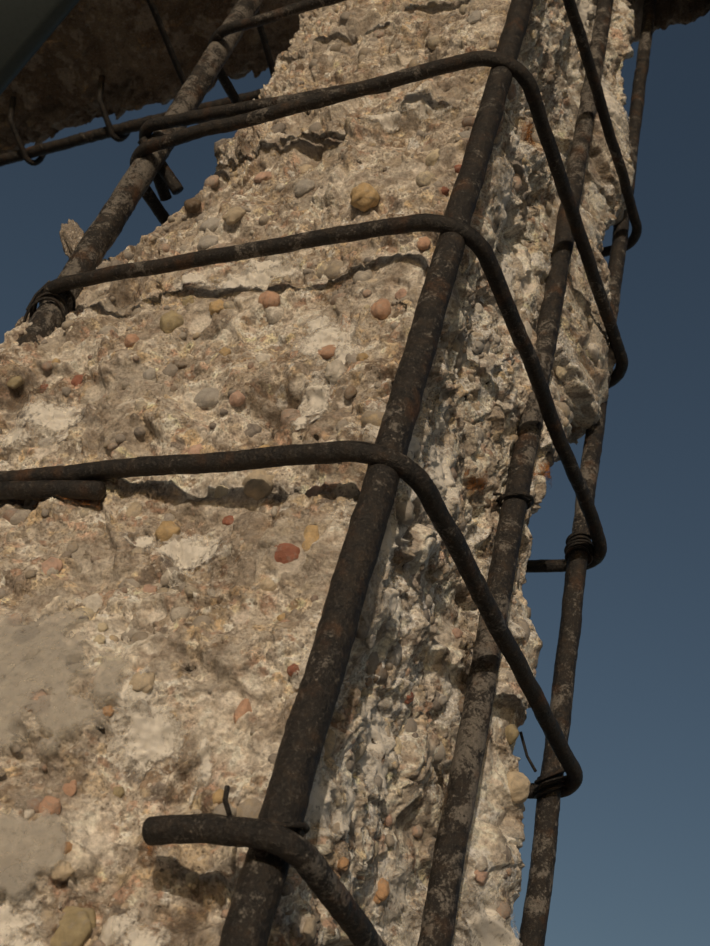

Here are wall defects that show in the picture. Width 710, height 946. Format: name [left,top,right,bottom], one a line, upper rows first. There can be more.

rust [464,469,492,492]